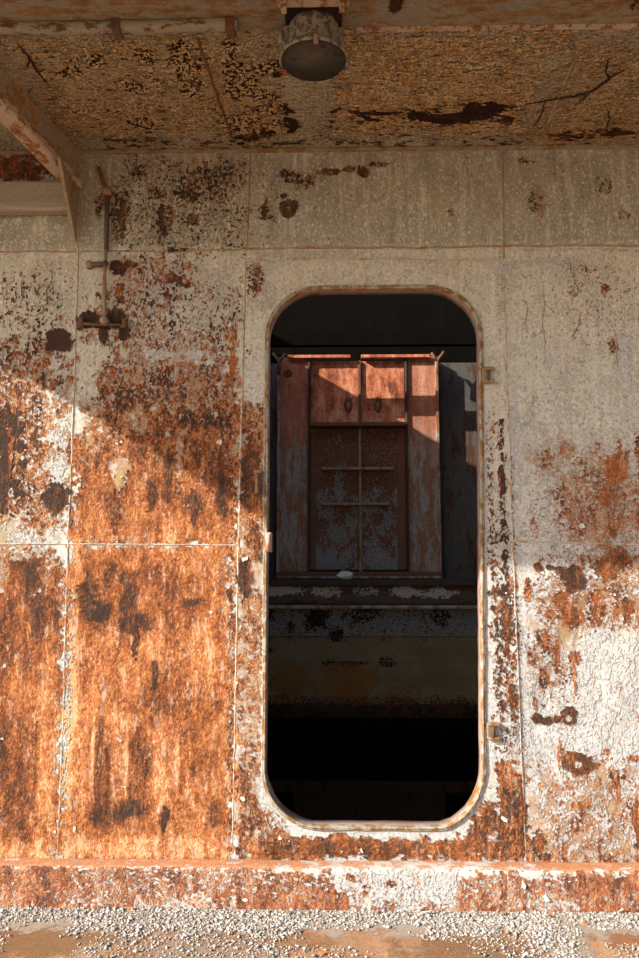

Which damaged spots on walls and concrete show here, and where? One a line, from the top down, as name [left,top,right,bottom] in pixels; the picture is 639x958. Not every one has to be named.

rust [384,0,404,14]
rust [0,29,311,154]
rust [324,25,639,147]
crack [526,58,628,132]
rust [0,153,639,862]
rust [0,865,639,913]